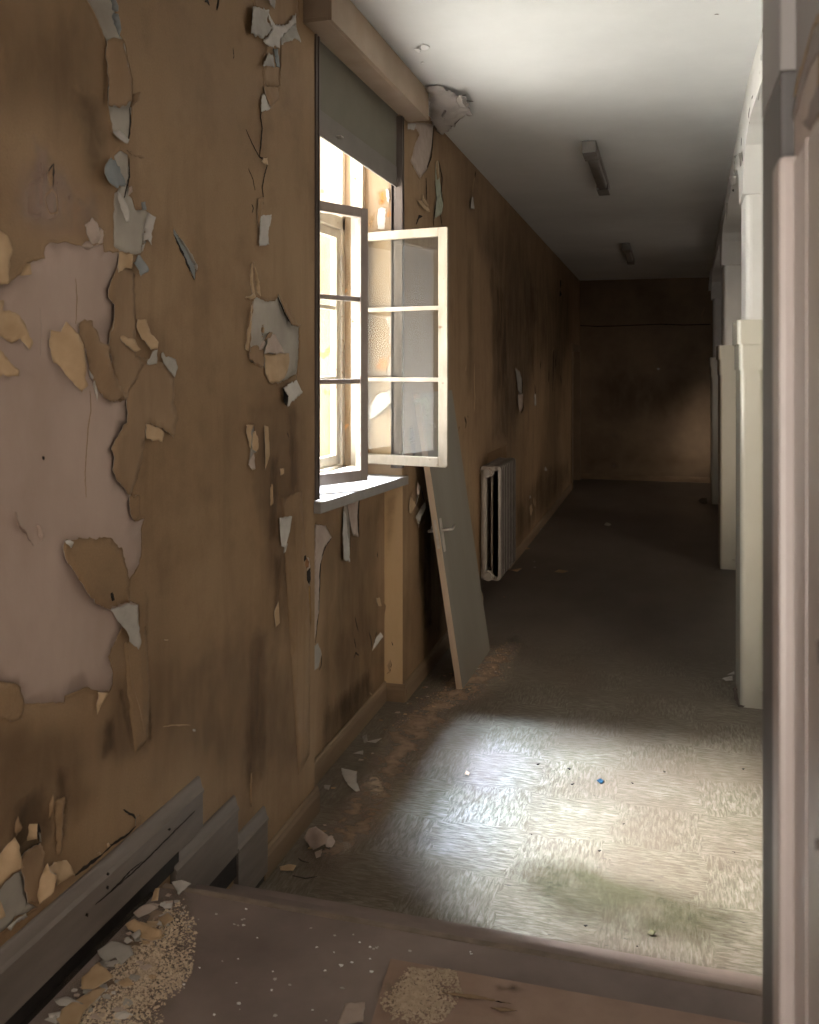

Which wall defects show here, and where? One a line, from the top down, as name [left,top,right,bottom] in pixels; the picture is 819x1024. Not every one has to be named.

peeling [251,0,301,112]
peeling [408,121,444,226]
peeling [171,223,198,283]
peeling [0,0,178,722]
peeling [245,262,303,407]
peeling [279,516,292,553]
peeling [304,501,360,670]
peeling [0,793,75,937]
crack [75,809,195,917]